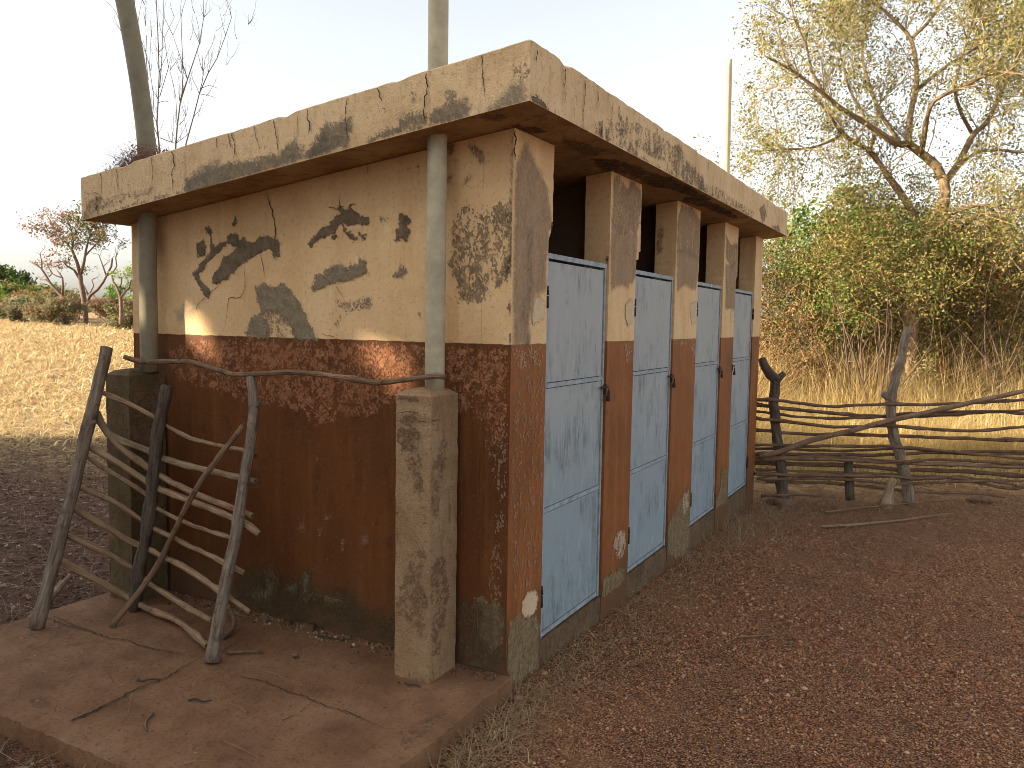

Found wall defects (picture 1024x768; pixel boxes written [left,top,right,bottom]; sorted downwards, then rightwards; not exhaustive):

leakage [368,90,472,142]
crack [85,152,175,210]
flaking render [192,216,282,299]
crack [195,110,310,322]
flaking render [311,258,369,292]
flaking render [307,204,411,248]
leakage [448,144,552,345]
leakage [562,116,780,231]
peeling [169,282,448,517]
flaking render [446,333,544,685]
crack [47,616,196,721]